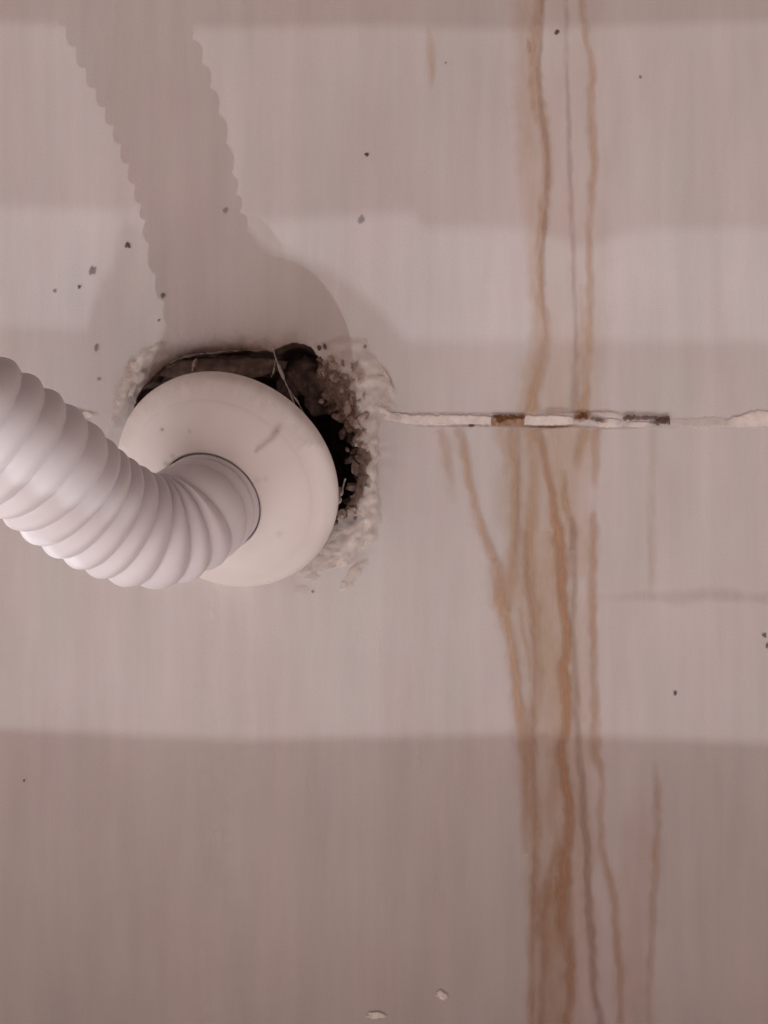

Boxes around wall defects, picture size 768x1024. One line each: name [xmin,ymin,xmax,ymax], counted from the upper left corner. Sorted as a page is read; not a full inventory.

spalling [117,351,151,405]
crack [386,412,670,429]
crack [727,410,768,428]
spalling [159,343,396,590]
corrosion [544,458,590,929]